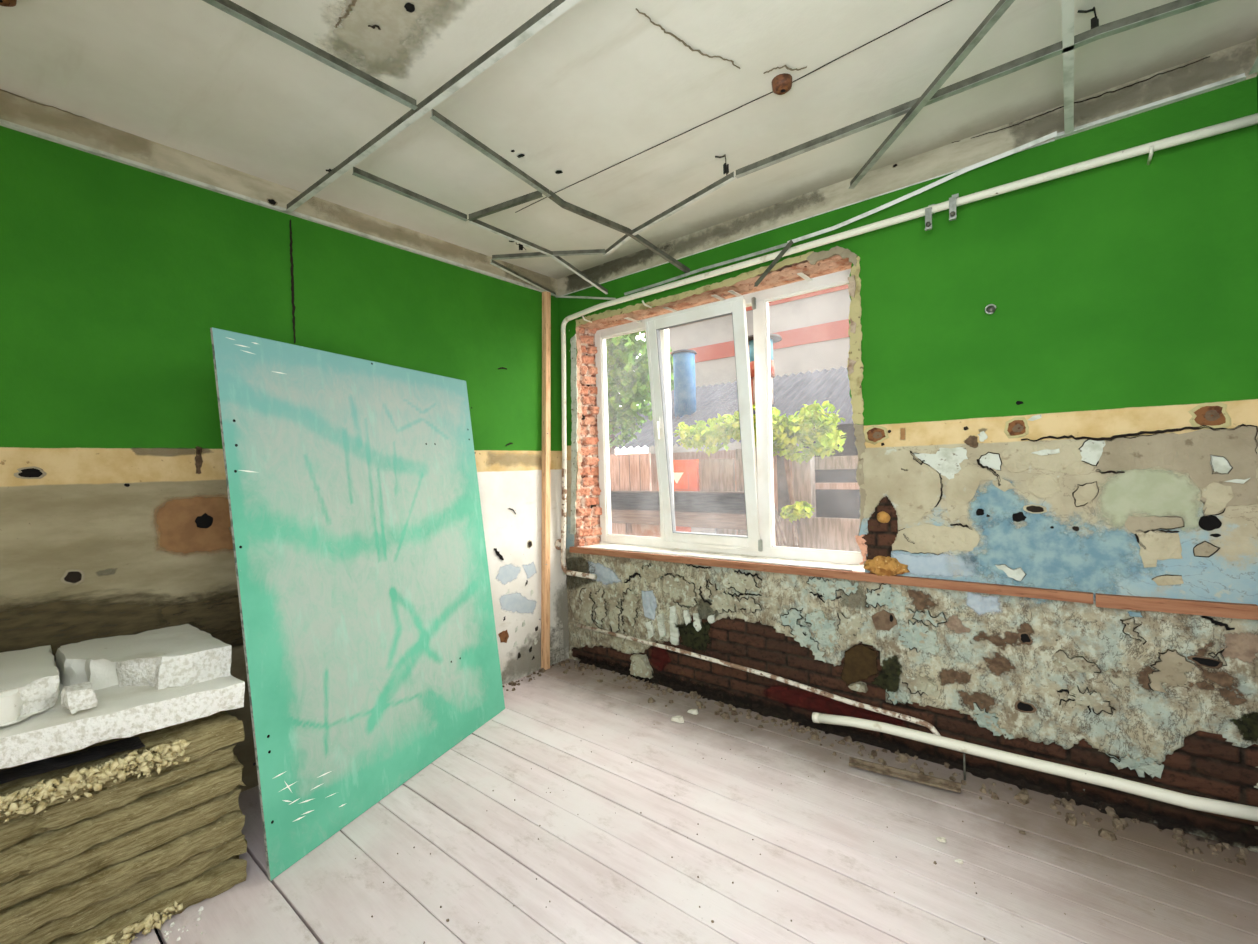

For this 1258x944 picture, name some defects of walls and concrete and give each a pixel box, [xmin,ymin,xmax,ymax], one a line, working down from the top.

damp [332,0,446,72]
crack [515,0,952,213]
flaking render [561,246,1258,848]